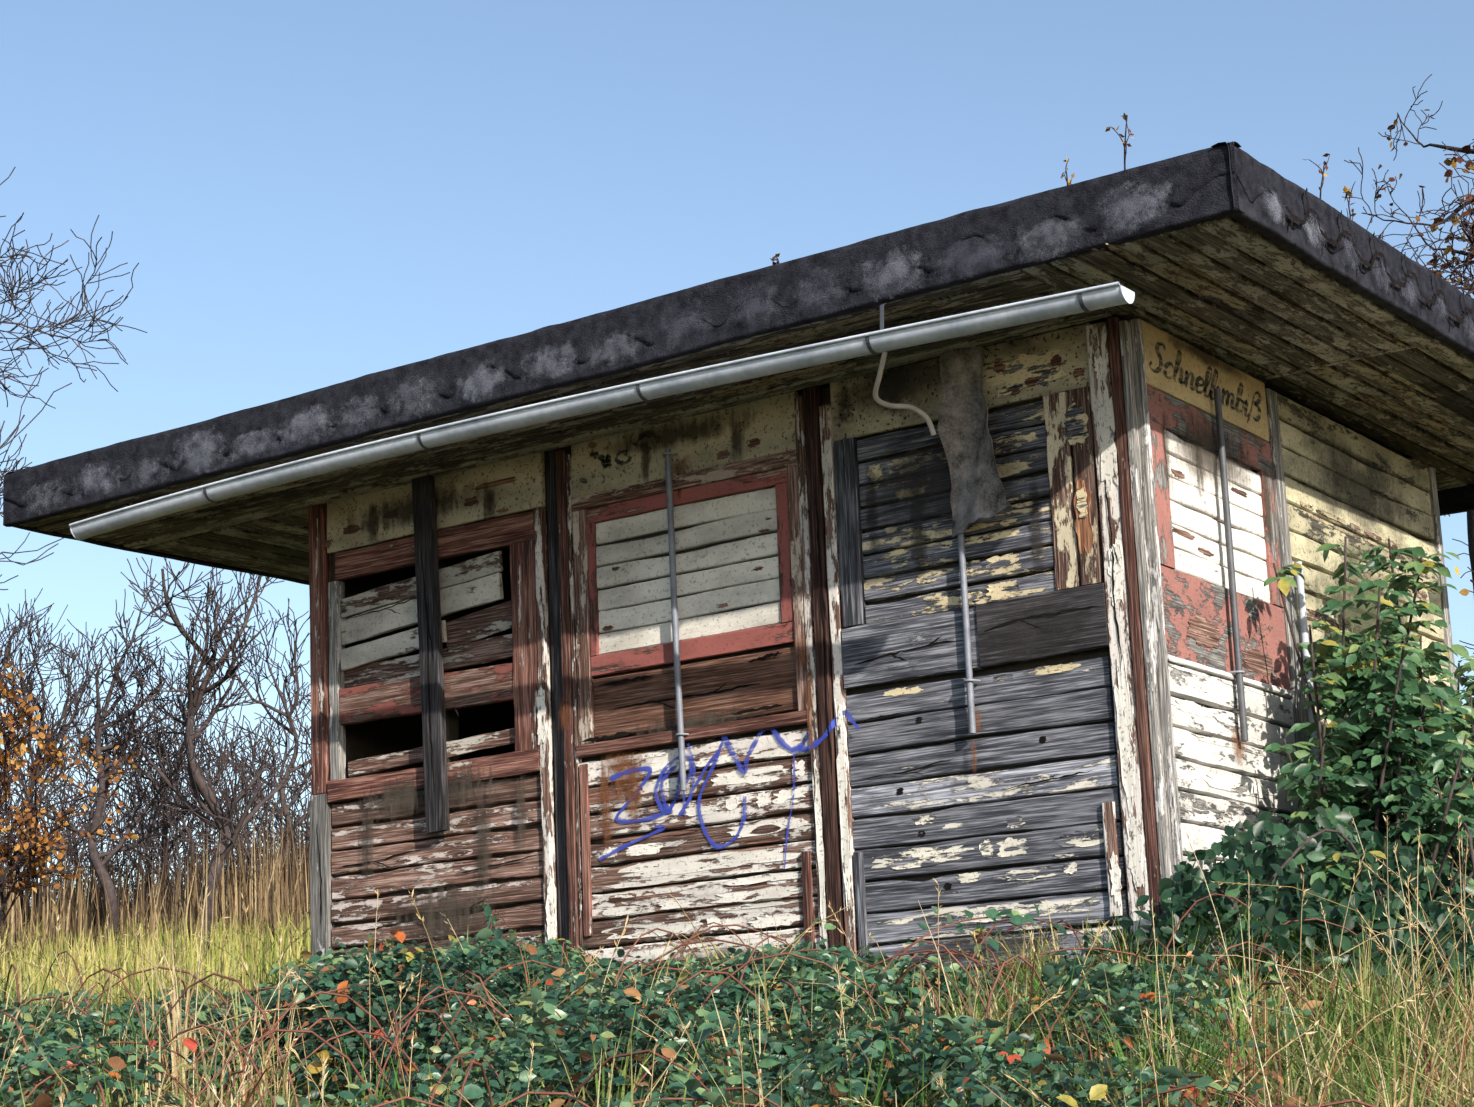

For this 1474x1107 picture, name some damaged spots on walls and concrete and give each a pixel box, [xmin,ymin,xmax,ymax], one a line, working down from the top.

peeling [984,349,1124,606]
peeling [917,501,1033,611]
peeling [1172,526,1214,556]
peeling [1169,649,1275,697]
peeling [536,685,547,745]
peeling [334,801,384,812]
peeling [348,838,384,846]
peeling [395,849,473,865]
peeling [471,819,535,830]
peeling [589,702,852,964]
peeling [871,653,1150,948]
peeling [339,877,556,947]